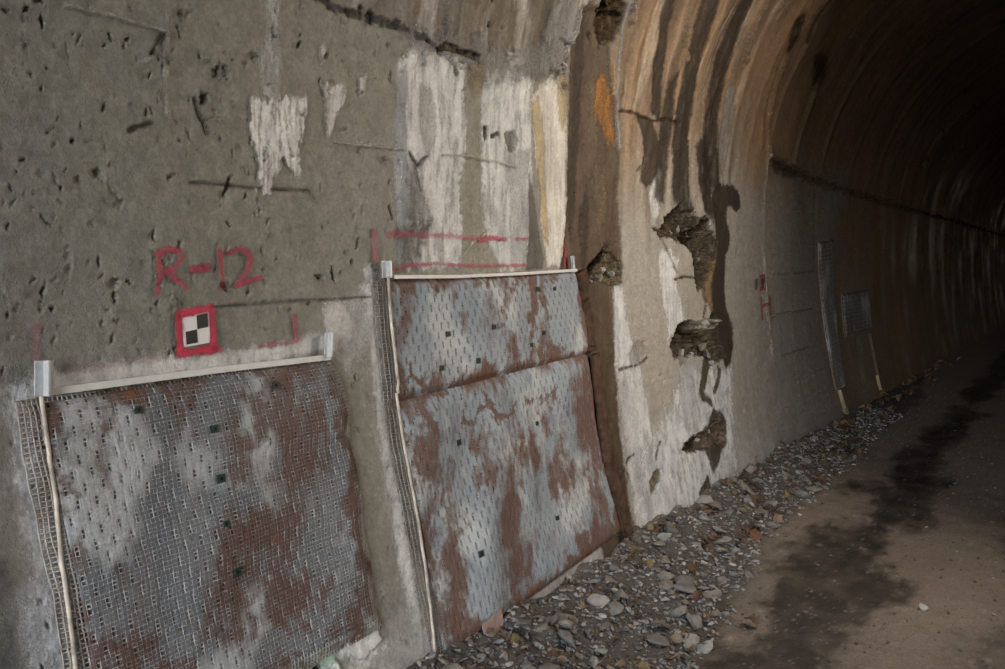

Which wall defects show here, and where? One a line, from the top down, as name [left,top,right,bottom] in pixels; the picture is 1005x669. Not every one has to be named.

crack [315,0,458,76]
rust [594,63,617,144]
crack [620,109,677,123]